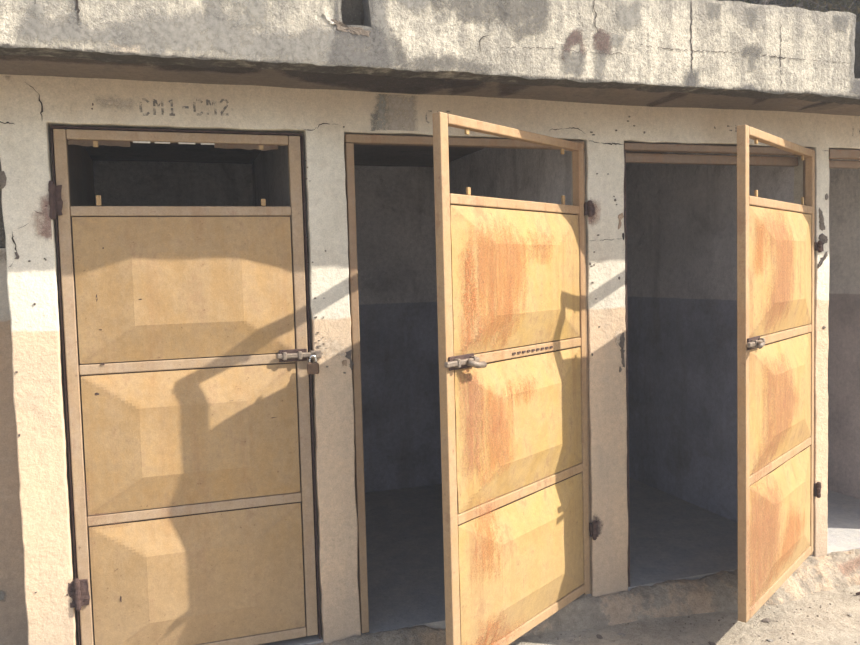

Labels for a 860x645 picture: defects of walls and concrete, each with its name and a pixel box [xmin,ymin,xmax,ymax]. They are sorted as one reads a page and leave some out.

water stain [0,0,495,131]
water stain [401,0,551,40]
corrosion [563,29,624,79]
crack [479,0,852,84]
water stain [648,70,701,107]
water stain [742,45,763,71]
water stain [834,15,860,95]